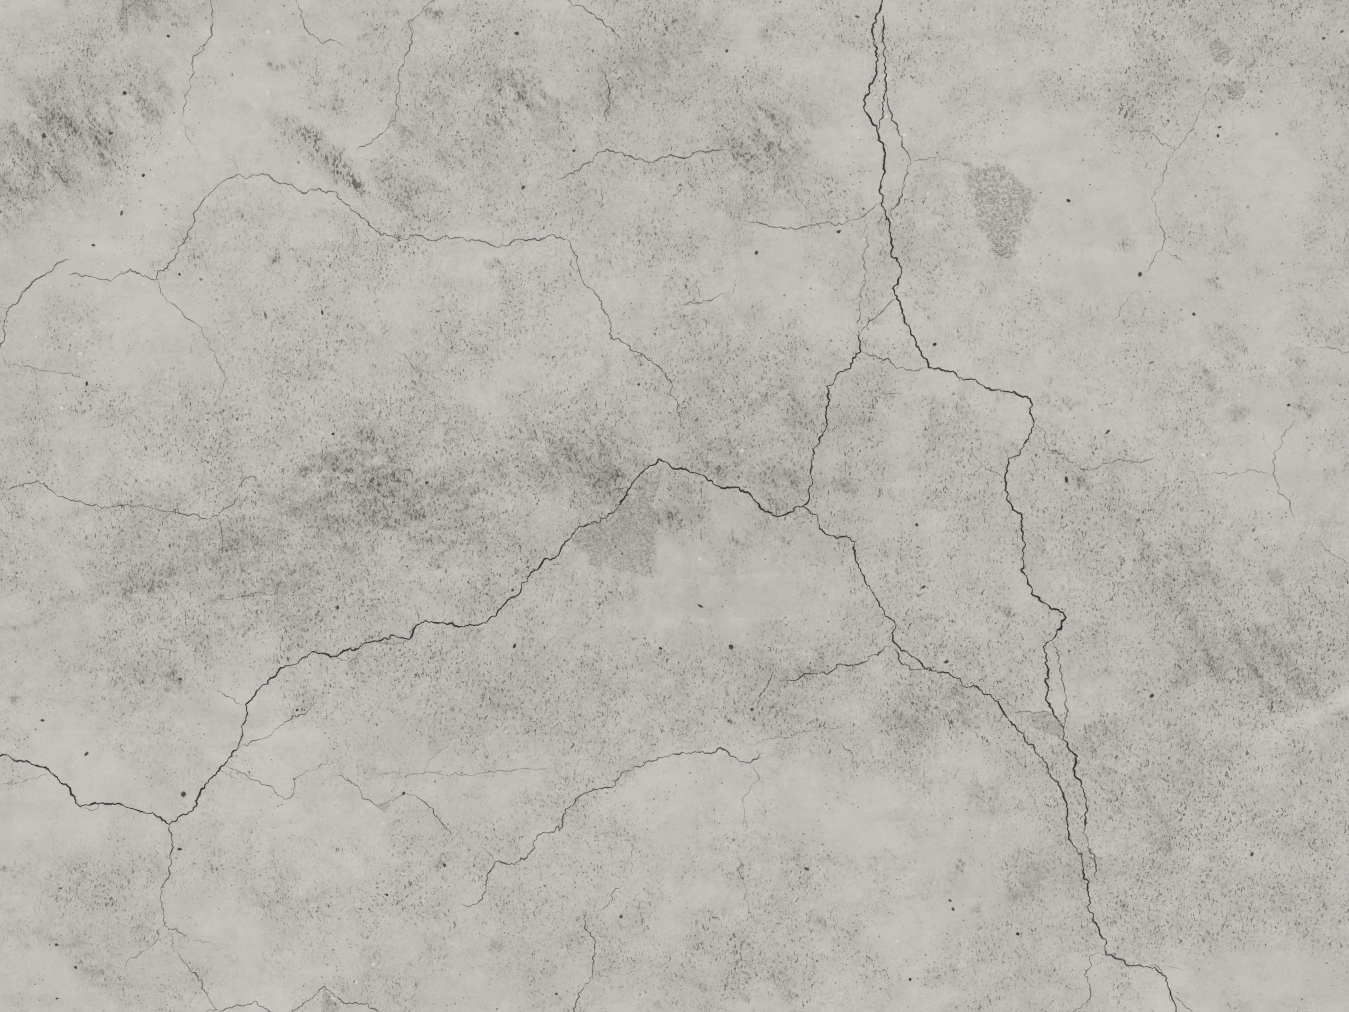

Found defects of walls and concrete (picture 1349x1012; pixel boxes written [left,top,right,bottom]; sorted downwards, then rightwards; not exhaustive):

crack [576,149,717,171]
crack [0,264,57,345]
crack [131,174,680,414]
crack [863,0,1088,830]
crack [0,304,1177,1012]